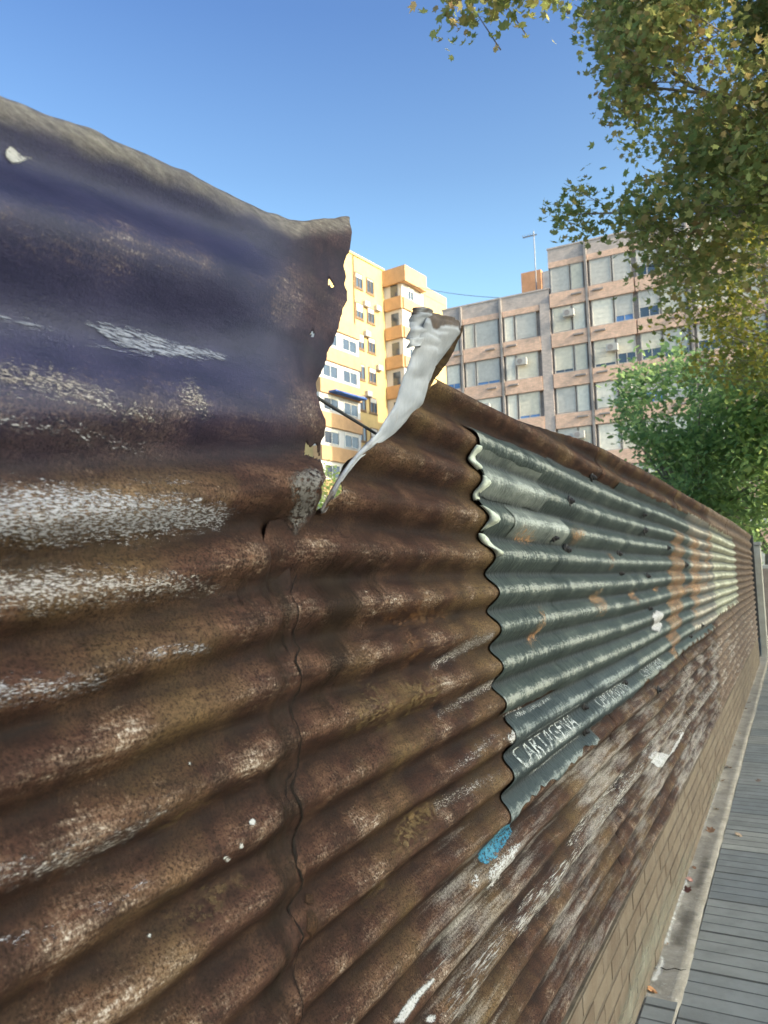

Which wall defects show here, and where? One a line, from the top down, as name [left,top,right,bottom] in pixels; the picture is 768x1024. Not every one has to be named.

crack [279,564,311,1024]